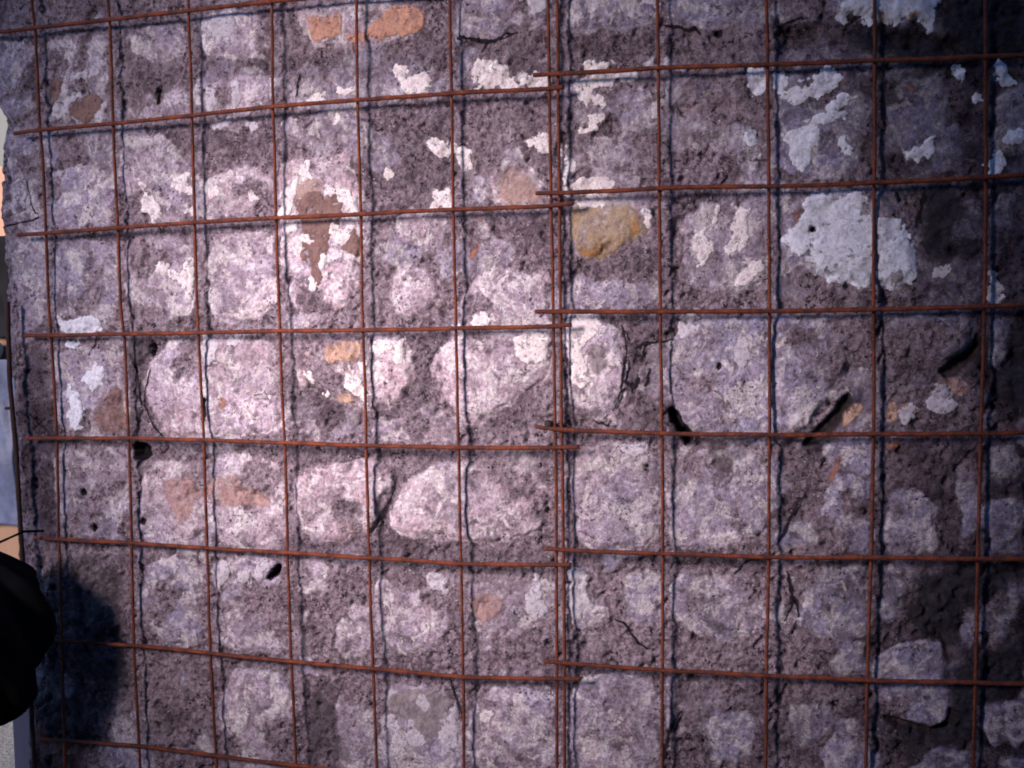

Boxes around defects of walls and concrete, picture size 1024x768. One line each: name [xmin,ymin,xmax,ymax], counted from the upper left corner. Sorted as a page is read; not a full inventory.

rust [569,205,646,259]
crack [593,325,673,427]